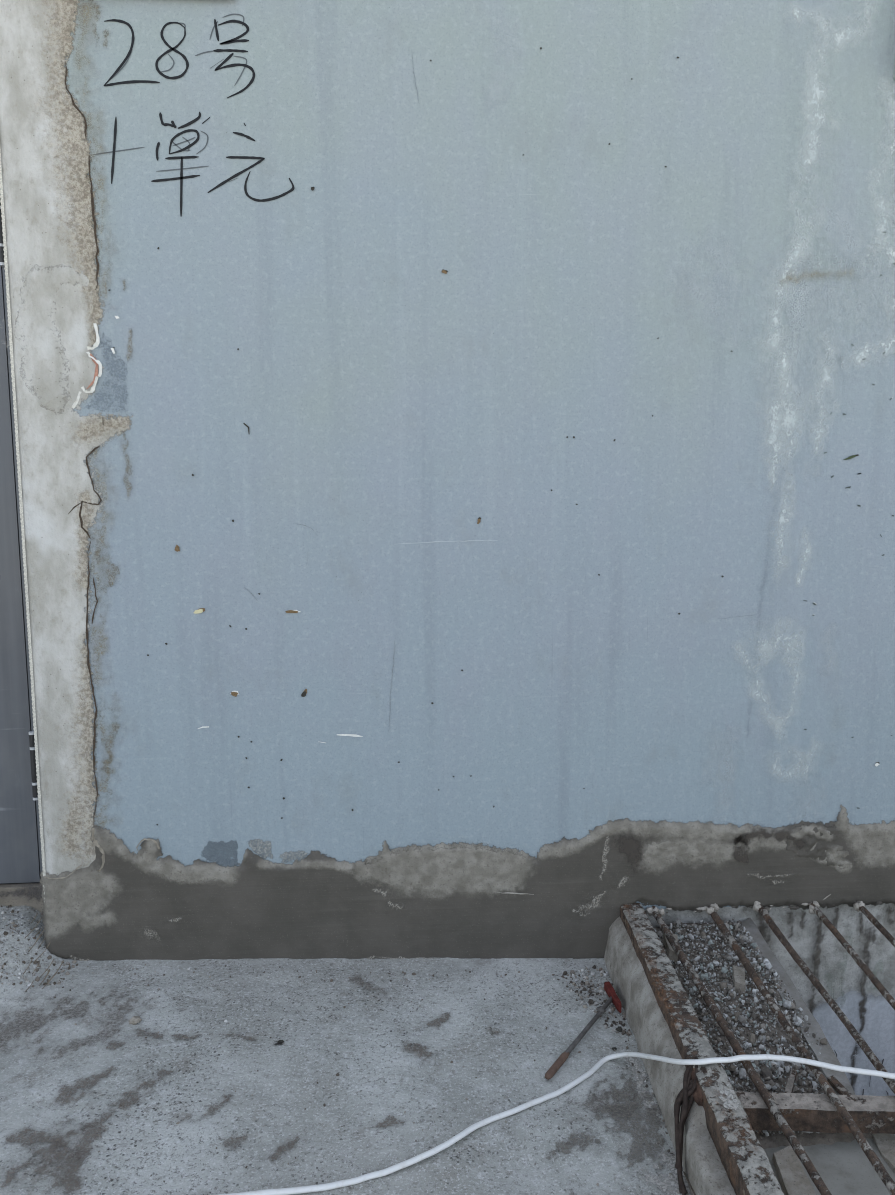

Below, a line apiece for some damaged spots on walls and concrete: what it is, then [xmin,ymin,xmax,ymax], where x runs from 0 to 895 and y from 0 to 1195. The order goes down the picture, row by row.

peeling [0,0,132,879]
crack [68,423,104,819]
water stain [767,4,895,566]